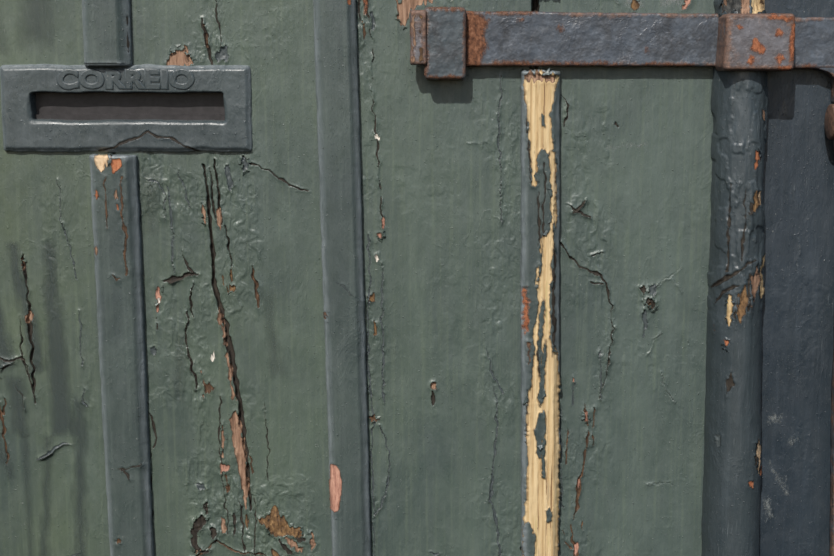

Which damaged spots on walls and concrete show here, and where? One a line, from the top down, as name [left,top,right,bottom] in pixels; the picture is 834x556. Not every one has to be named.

crack [201,0,222,65]
corrosion [431,7,532,67]
peeling [521,68,556,83]
corrosion [747,37,766,64]
corrosion [768,13,795,71]
crack [0,254,36,464]
crack [98,130,270,556]
peeling [522,267,540,364]
crack [526,119,614,556]
peeling [639,284,659,337]
peeling [725,254,766,326]
peeling [190,411,316,556]